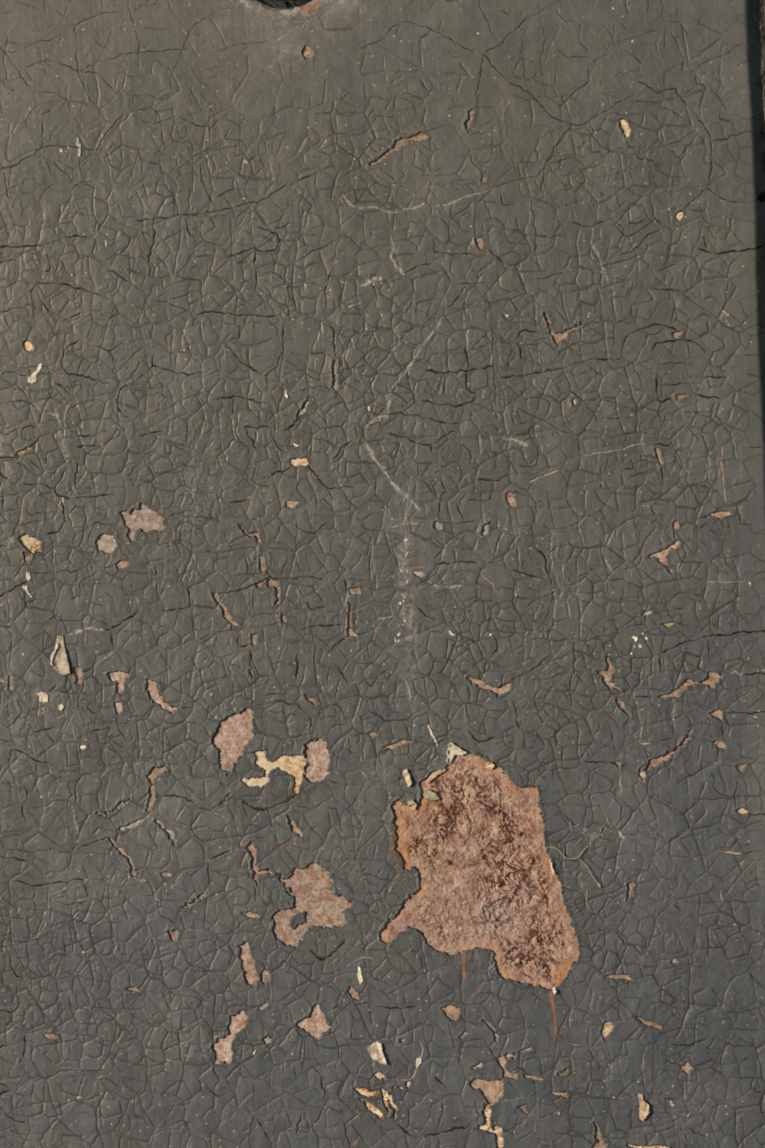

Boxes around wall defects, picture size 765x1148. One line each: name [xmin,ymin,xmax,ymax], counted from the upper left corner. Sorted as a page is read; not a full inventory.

crack [0,1,412,907]
peeling [121,504,166,541]
crack [659,607,765,671]
peeling [213,708,330,793]
crack [468,656,671,793]
crack [693,692,765,874]
peeling [247,843,351,947]
corrosion [380,742,579,1041]
crack [310,939,373,968]
peeling [213,1010,247,1064]
peeling [297,1004,332,1039]
peeling [471,1047,542,1148]